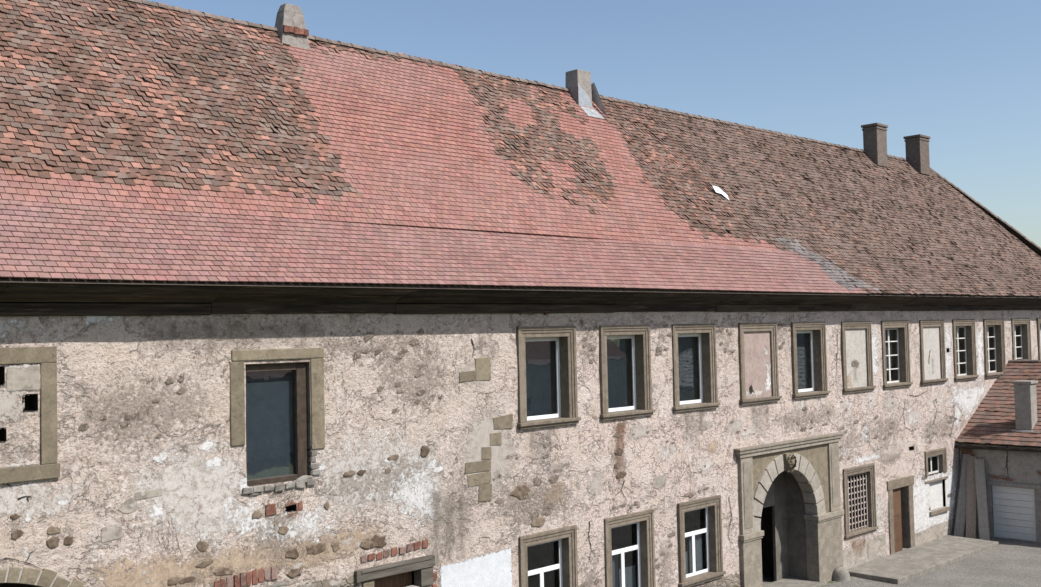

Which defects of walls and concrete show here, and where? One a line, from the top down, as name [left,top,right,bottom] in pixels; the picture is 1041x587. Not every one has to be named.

spalling [165,375,187,394]
spalling [377,372,426,404]
flaking render [455,356,496,391]
peeling [93,400,565,587]
peeling [0,479,89,565]